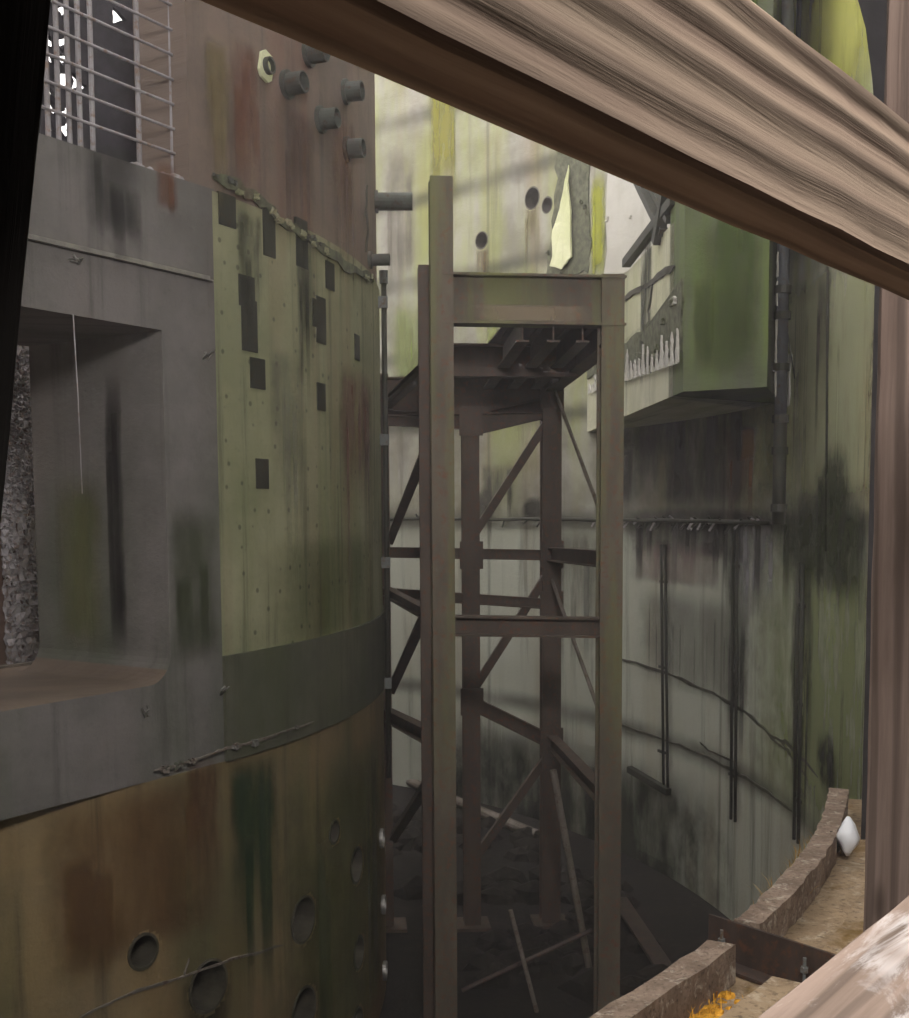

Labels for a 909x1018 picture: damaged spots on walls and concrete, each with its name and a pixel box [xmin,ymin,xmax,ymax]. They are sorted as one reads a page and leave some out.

water stain [636,511,789,708]
crack [622,724,793,812]
crack [622,659,818,778]